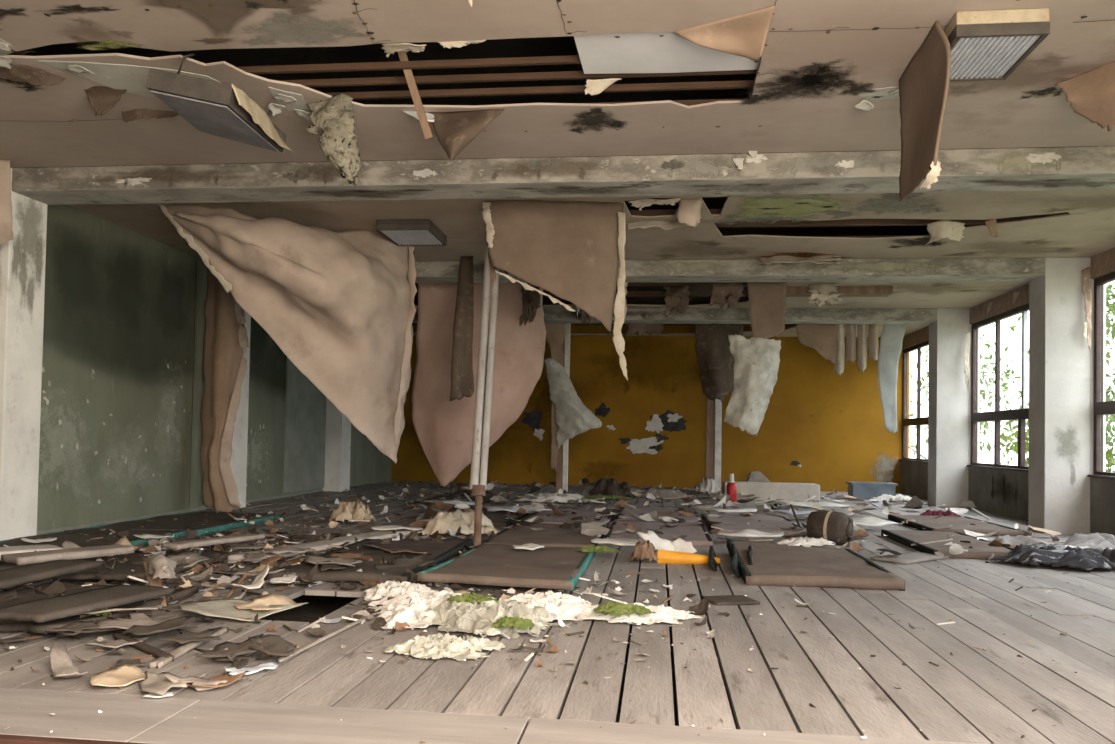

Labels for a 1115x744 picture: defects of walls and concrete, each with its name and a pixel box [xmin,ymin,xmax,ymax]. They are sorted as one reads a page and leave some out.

leakage [0,78,38,91]
peeling [38,60,221,98]
leakage [741,62,894,104]
peeling [268,87,311,121]
leakage [571,108,624,133]
leakage [122,170,217,186]
leakage [294,167,431,198]
leakage [493,161,626,193]
leakage [669,154,937,225]
leakage [976,151,1114,186]
peeling [520,410,545,441]
peeling [594,402,688,454]